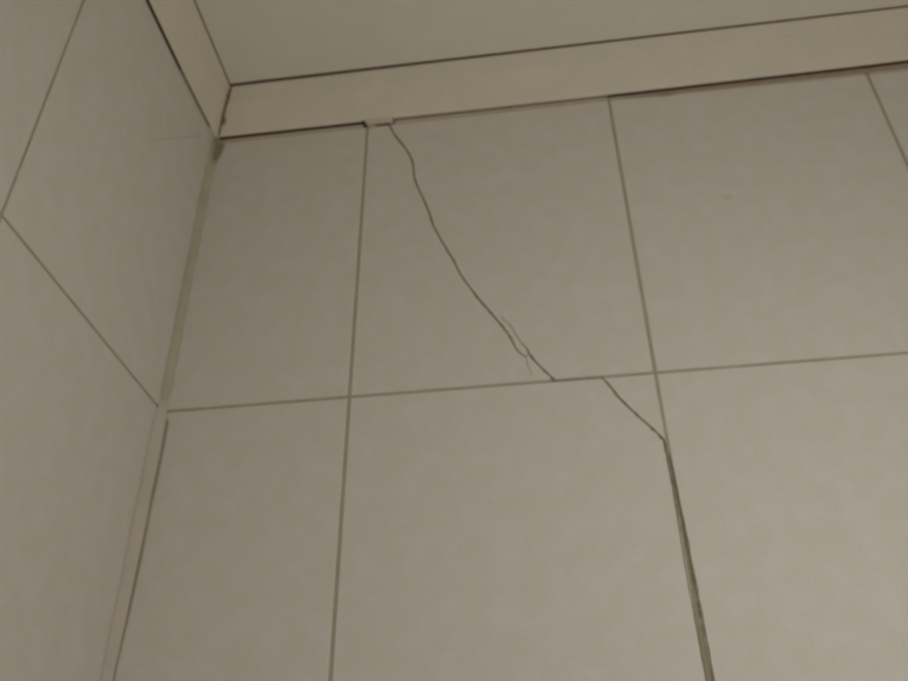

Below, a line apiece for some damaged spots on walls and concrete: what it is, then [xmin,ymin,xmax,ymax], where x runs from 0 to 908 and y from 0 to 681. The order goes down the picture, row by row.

crack [362,117,715,681]